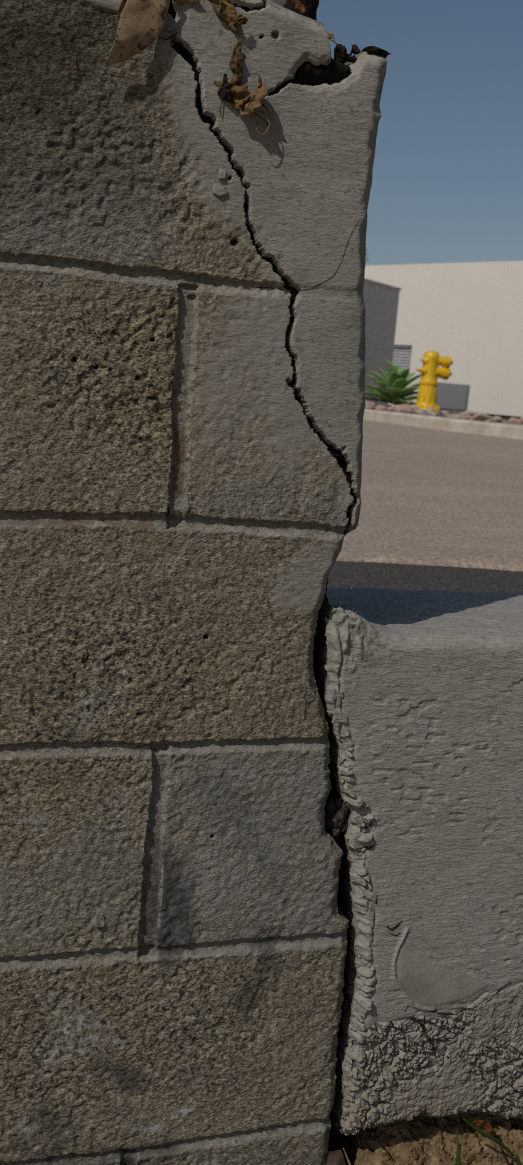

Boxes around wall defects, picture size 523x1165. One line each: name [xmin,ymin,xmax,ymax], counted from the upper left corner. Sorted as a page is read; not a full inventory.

crack [157,32,359,527]
crack [304,581,328,718]
crack [324,734,402,1043]
crack [328,982,523,1165]